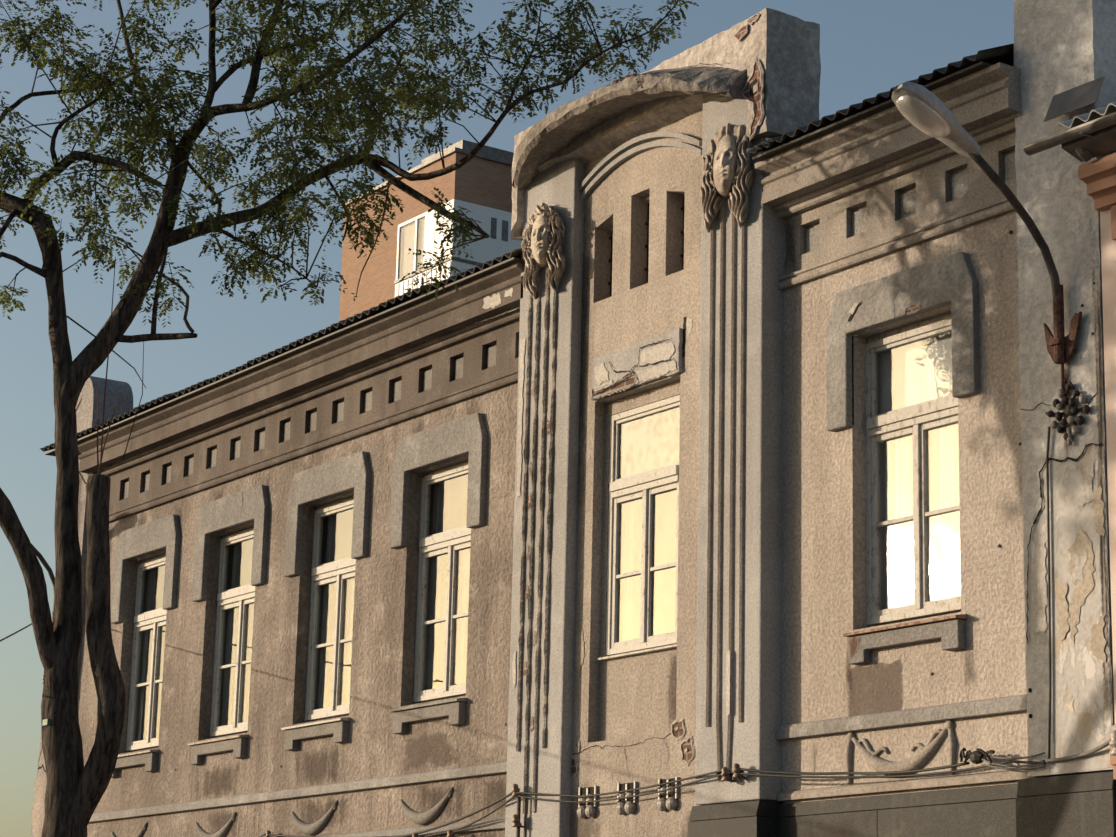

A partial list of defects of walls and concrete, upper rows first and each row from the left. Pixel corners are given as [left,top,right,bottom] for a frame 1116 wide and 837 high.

flaking render [733,13,760,42]
flaking render [742,58,765,141]
peeling [591,316,692,400]
peeling [1026,443,1116,773]
crack [572,729,683,779]
flaking render [671,718,695,767]